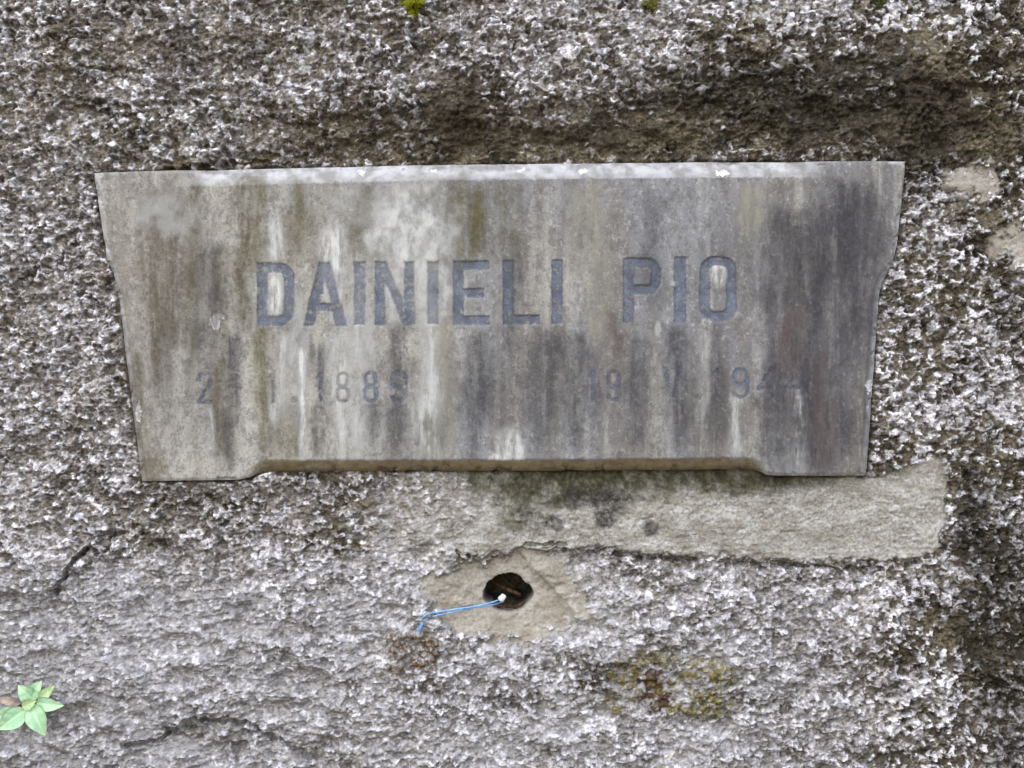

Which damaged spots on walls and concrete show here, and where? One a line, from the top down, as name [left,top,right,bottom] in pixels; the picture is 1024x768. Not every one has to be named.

leakage [237,213,282,319]
leakage [255,226,372,453]
leakage [359,185,483,454]
leakage [469,186,870,529]
crack [7,544,107,608]
peeling [419,455,949,657]